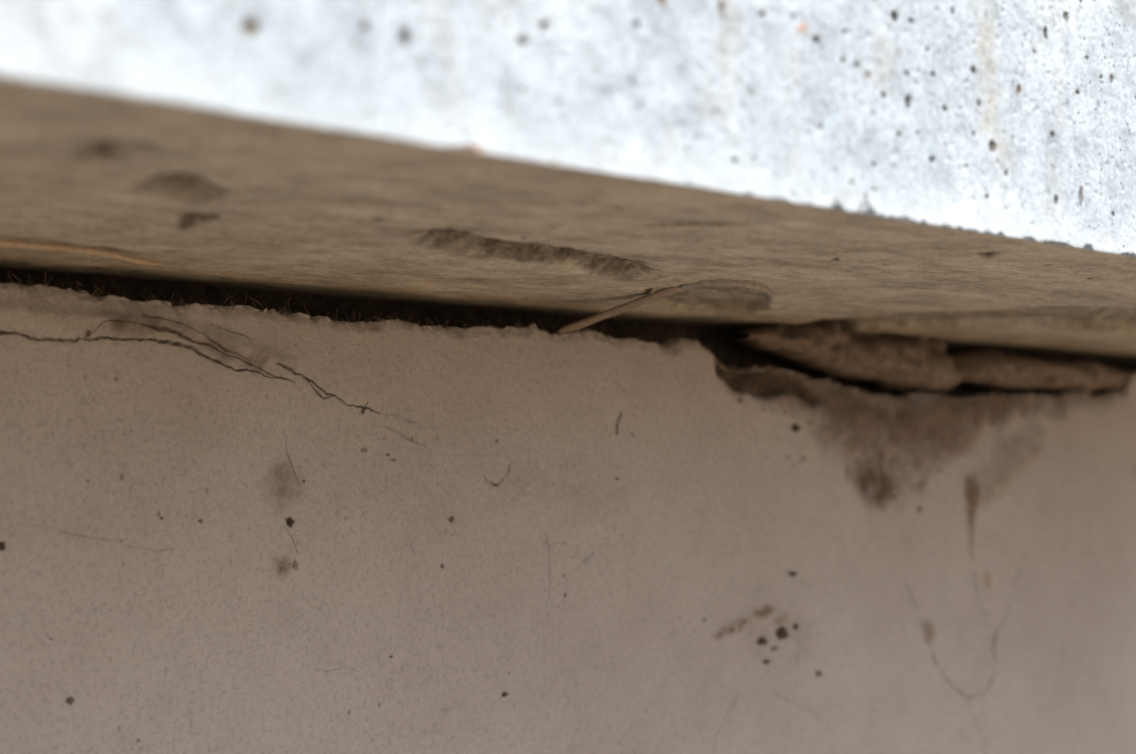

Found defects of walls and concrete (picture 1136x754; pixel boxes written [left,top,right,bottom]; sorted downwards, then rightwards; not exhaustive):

crack [0,317,381,414]
damp [967,478,979,526]